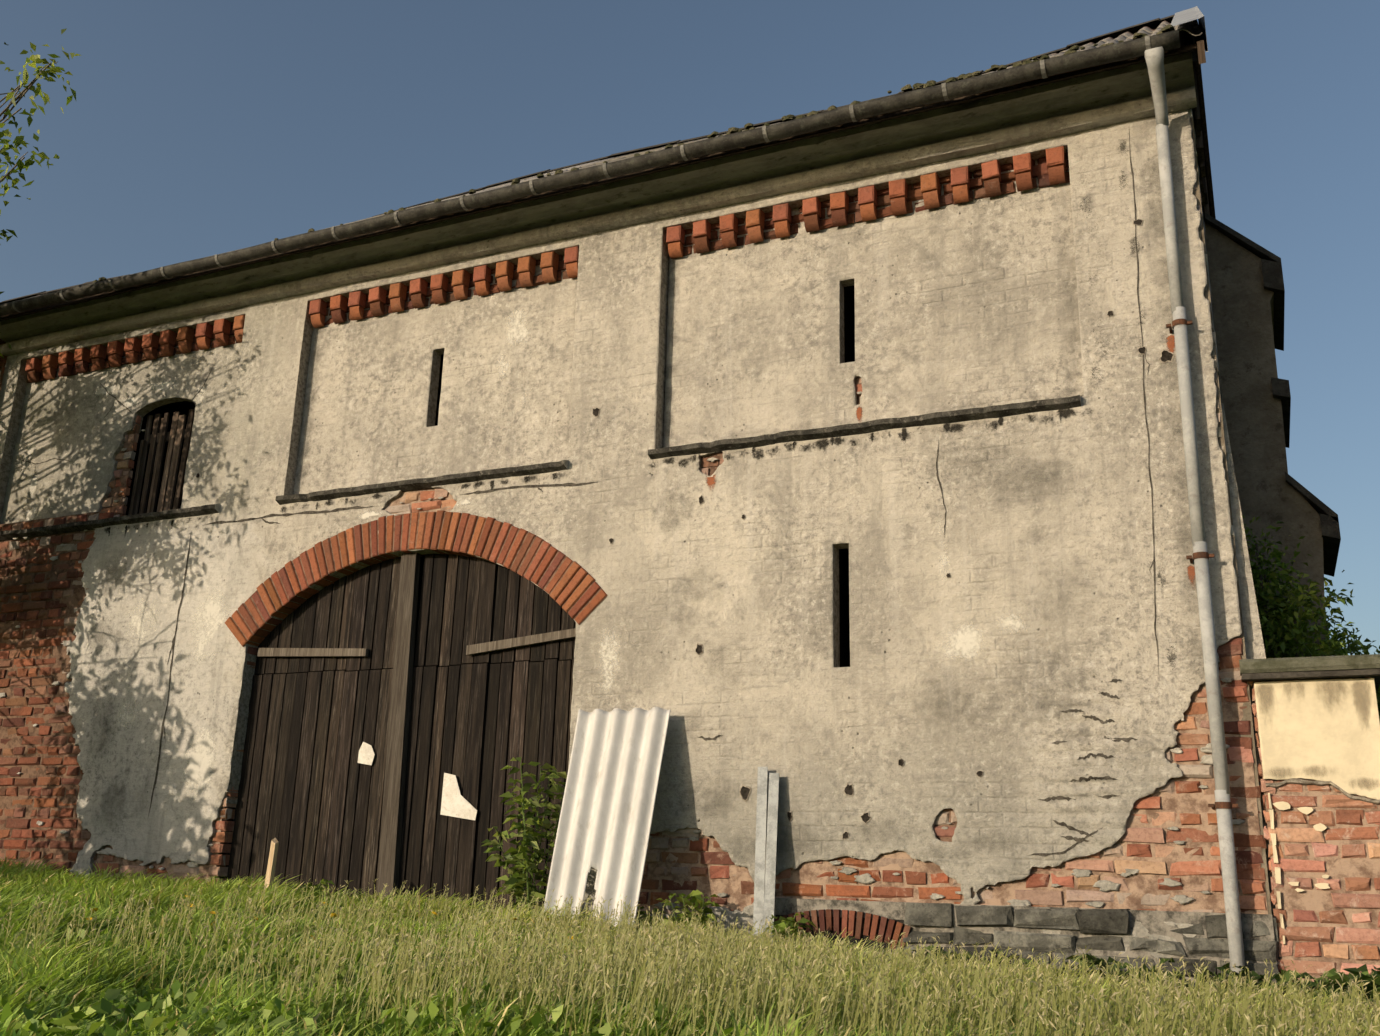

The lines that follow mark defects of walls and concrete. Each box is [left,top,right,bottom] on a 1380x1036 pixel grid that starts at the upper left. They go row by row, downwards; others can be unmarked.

flaking render [384,488,457,515]
crack [936,441,946,538]
crack [1129,134,1159,674]
flaking render [0,415,232,883]
crack [148,506,373,817]
flaking render [636,828,754,918]
flaking render [775,638,1380,914]